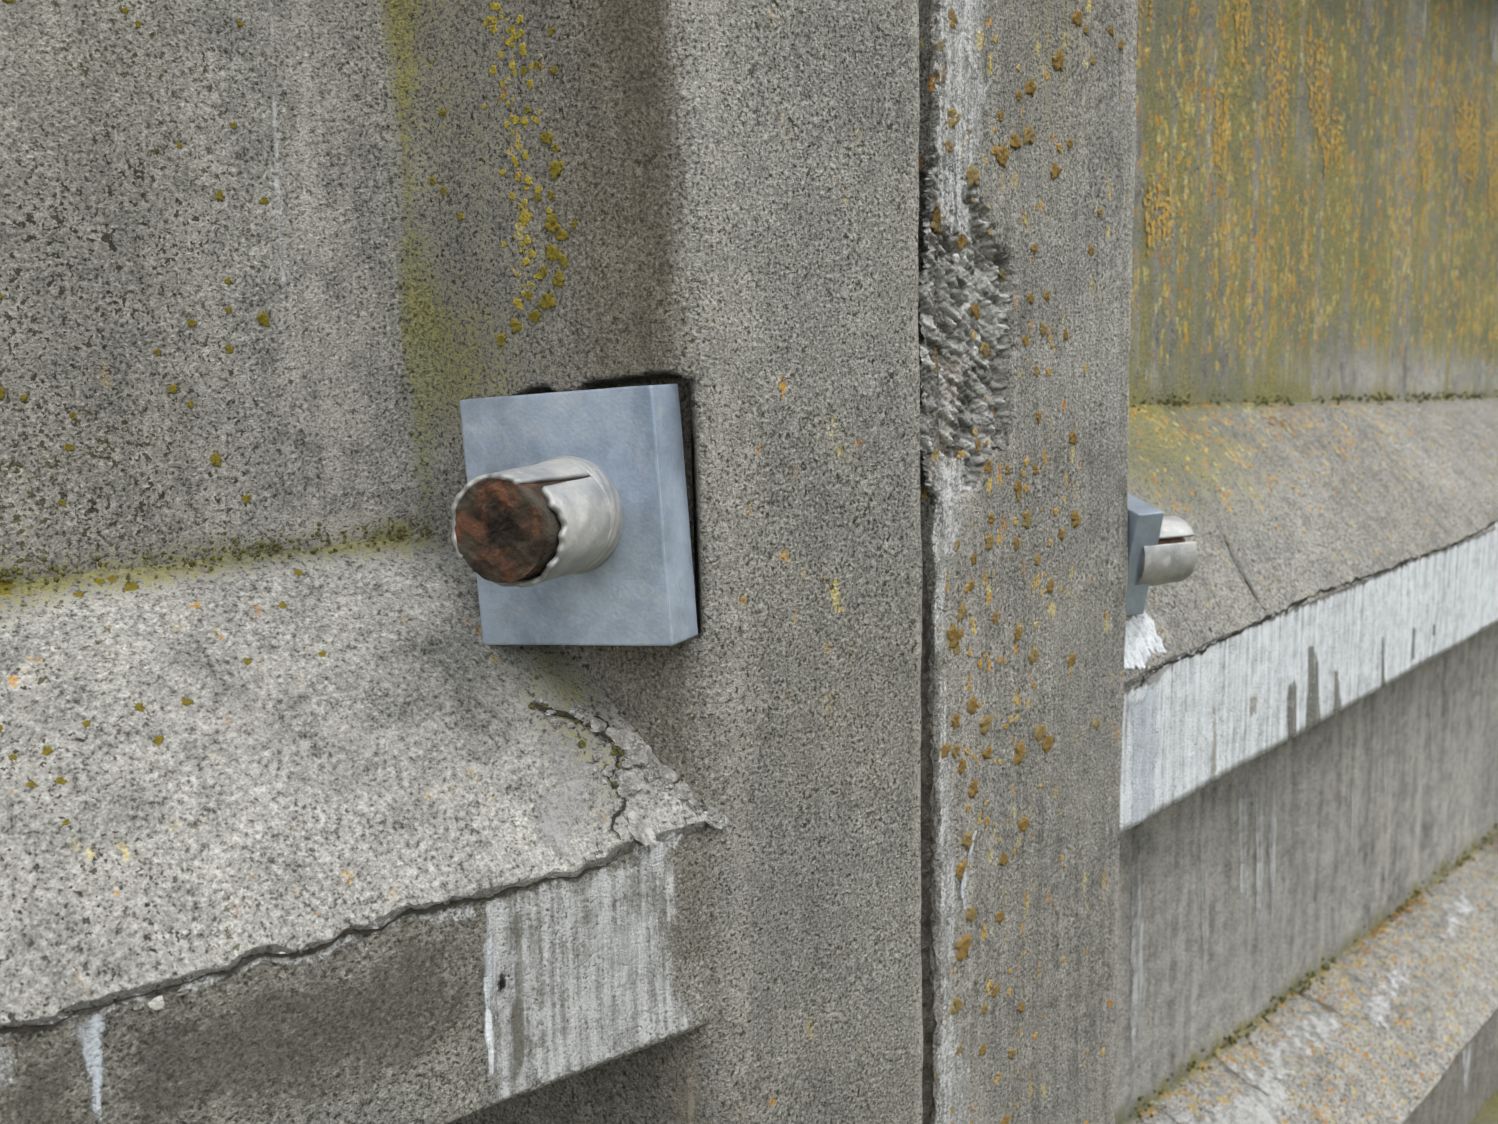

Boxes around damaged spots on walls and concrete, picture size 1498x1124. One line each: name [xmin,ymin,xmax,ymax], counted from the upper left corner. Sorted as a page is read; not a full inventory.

spalling [918,143,1014,530]
leakage [1138,175,1179,265]
leakage [1210,0,1347,201]
crack [0,693,729,1035]